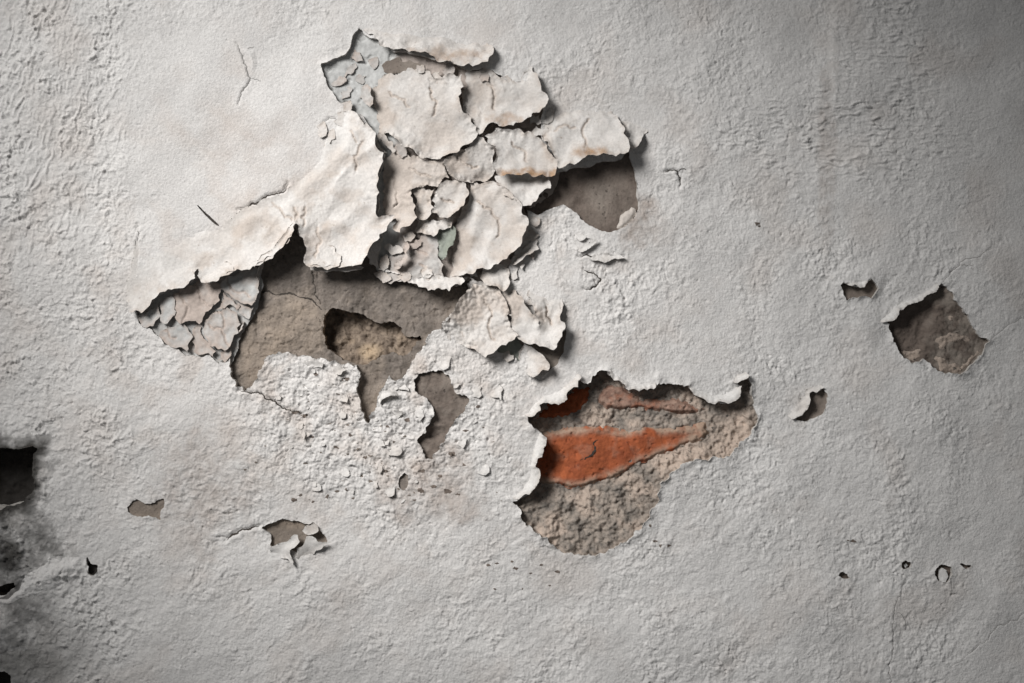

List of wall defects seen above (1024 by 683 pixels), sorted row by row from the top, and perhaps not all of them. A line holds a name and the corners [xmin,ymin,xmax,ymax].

crack [236,43,259,102]
peeling [126,28,648,503]
spalling [841,279,877,300]
spalling [881,283,989,374]
peeling [787,385,827,421]
spalling [496,370,758,555]
spalling [128,499,165,520]
peeling [263,519,327,566]